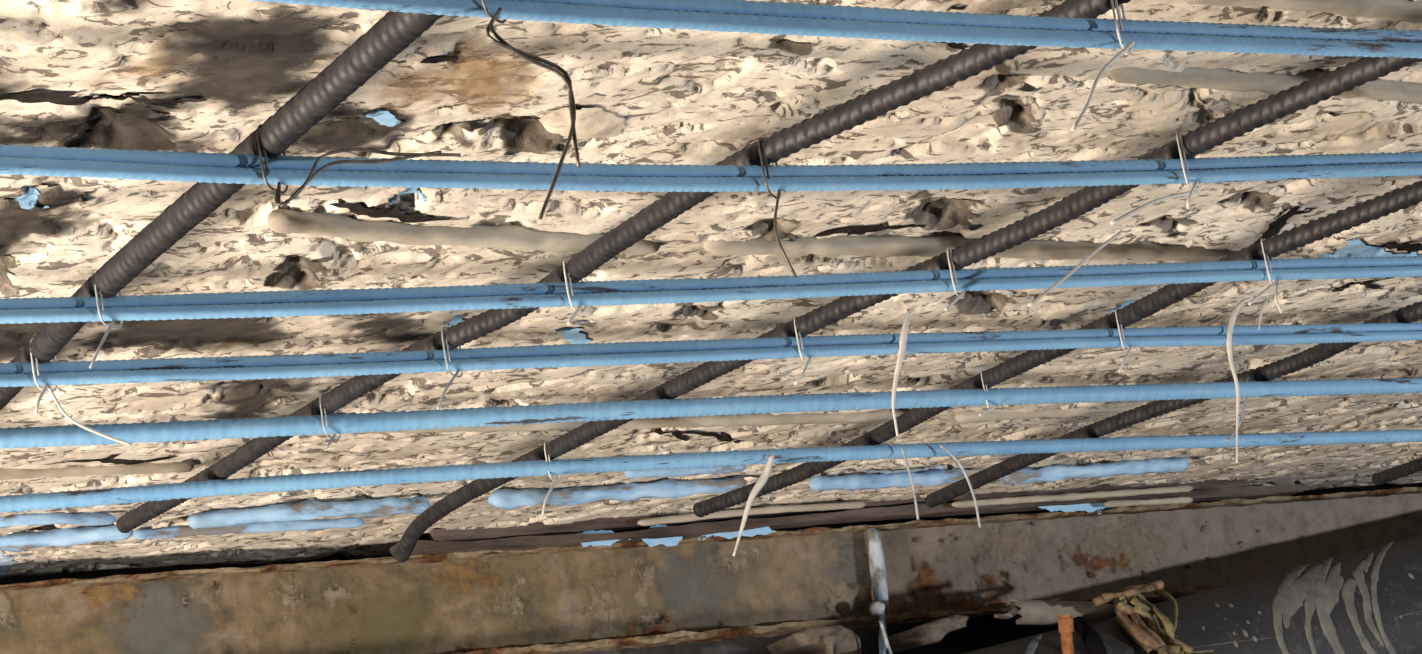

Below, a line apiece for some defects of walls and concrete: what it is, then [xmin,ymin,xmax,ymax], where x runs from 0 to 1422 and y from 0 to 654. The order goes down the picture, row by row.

rust [909,557,941,602]
rust [1061,545,1129,573]